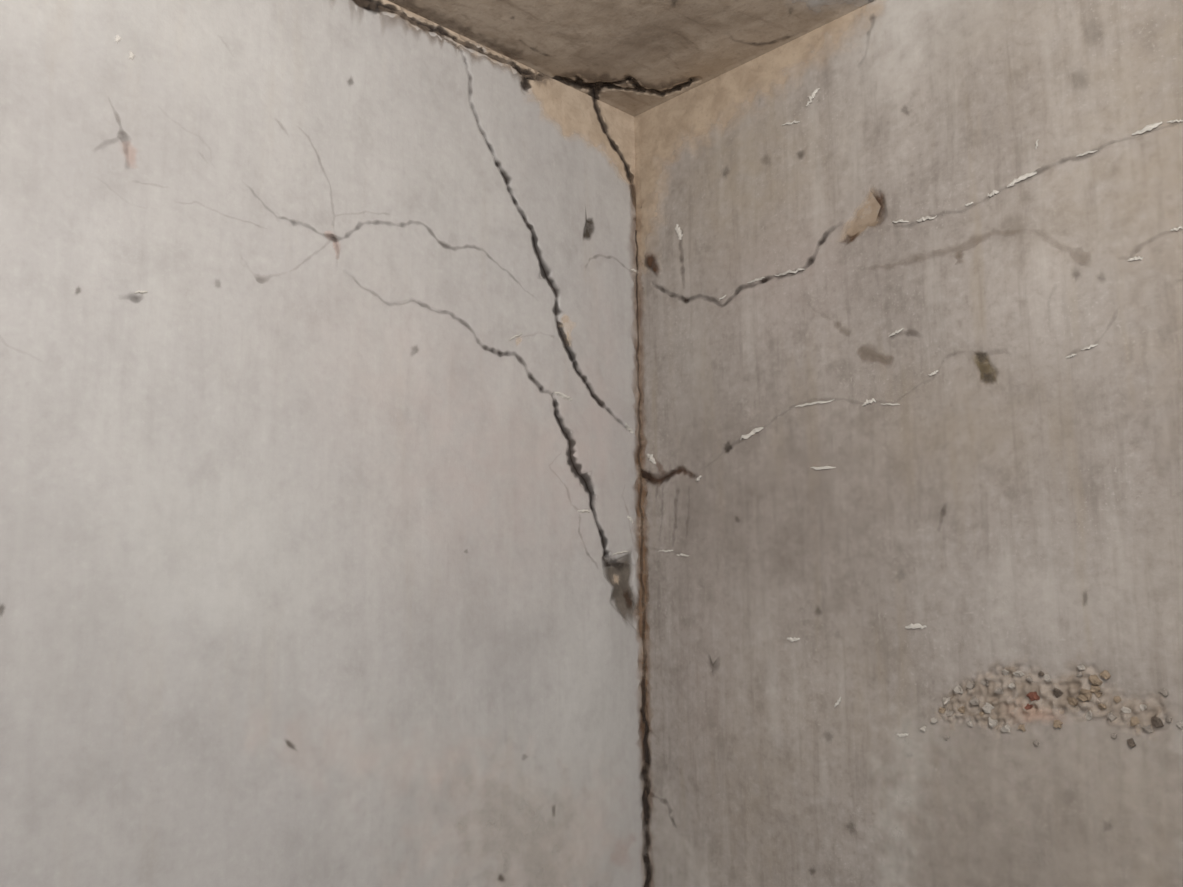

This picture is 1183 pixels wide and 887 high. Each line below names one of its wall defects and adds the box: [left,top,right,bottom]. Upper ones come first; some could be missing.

peeling [374,0,866,259]
crack [1132,119,1183,135]
crack [965,172,1037,206]
peeling [846,191,884,242]
crack [892,215,937,223]
crack [719,236,826,301]
crack [795,399,835,407]
crack [862,398,900,406]
crack [353,0,702,887]
crack [740,427,763,440]
spalling [605,556,636,618]
spalling [896,665,1183,748]